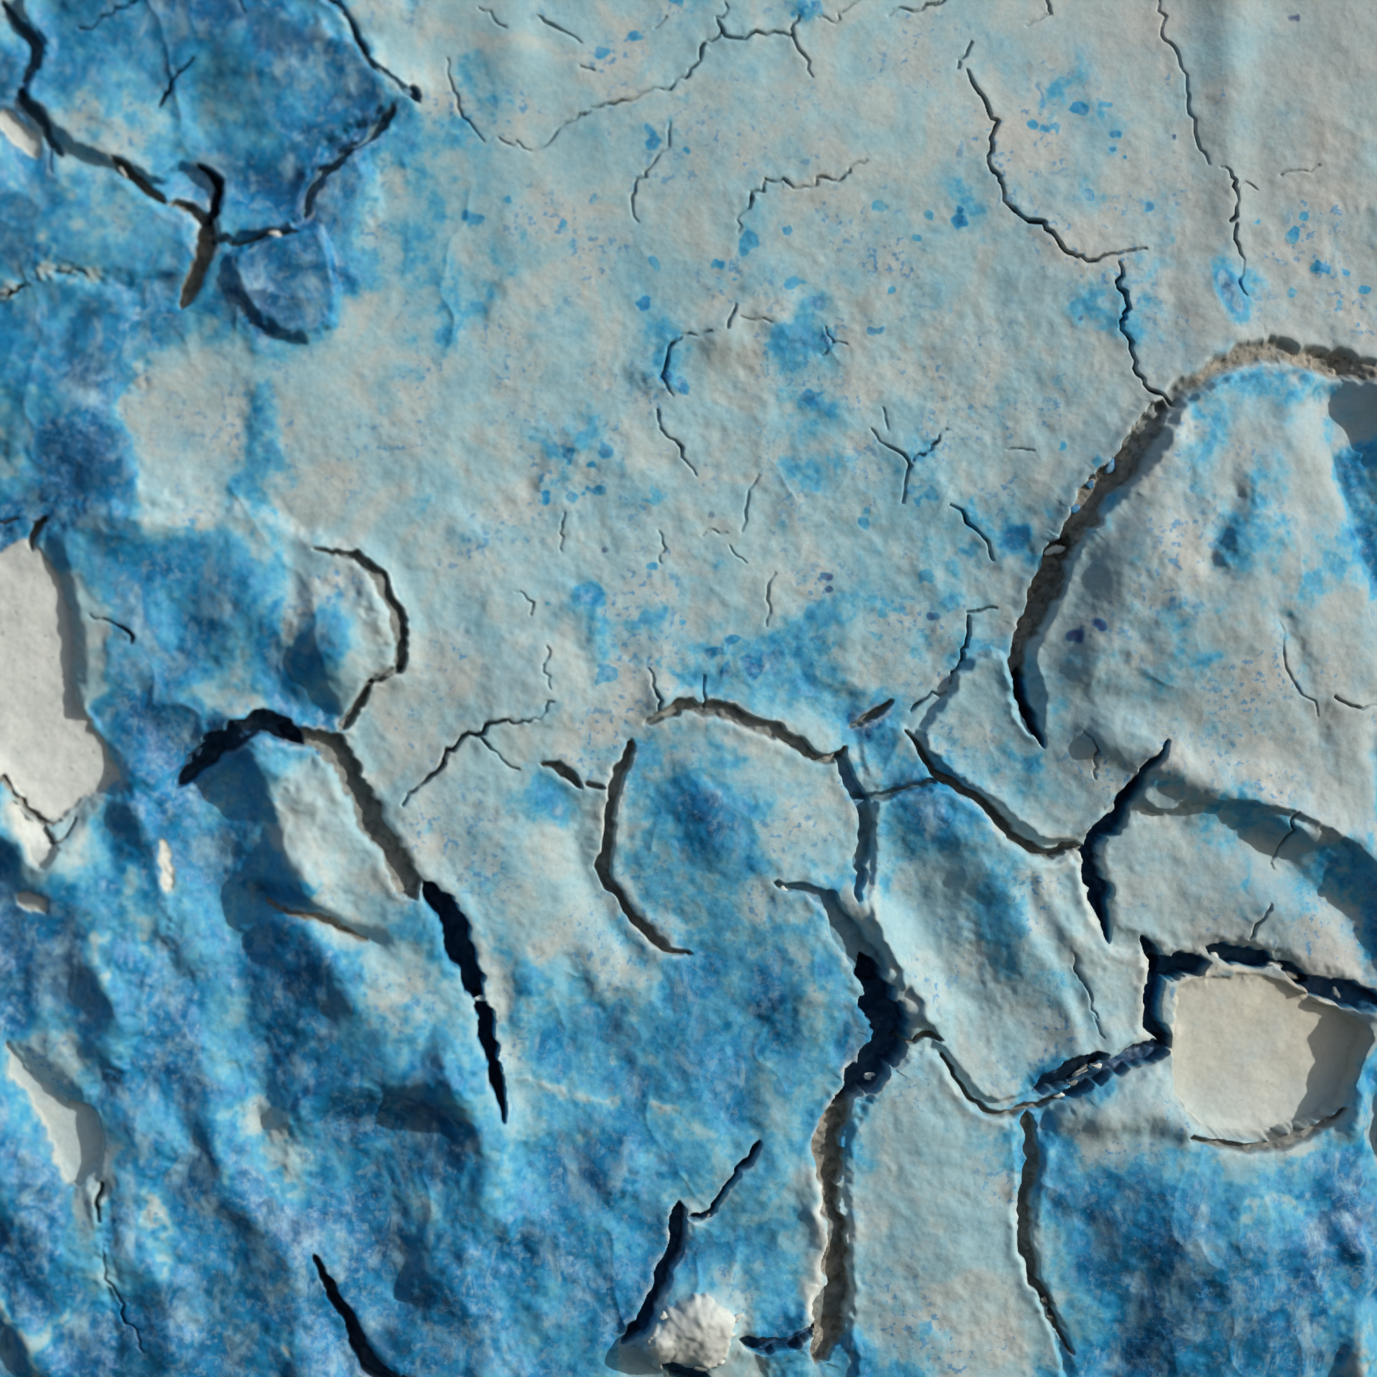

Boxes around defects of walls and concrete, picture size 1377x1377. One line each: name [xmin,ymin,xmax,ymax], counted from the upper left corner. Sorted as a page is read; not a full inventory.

crack [1,1,67,174]
crack [0,268,89,302]
crack [78,0,139,32]
crack [107,0,947,315]
crack [171,544,555,1131]
peeling [0,0,876,1377]
crack [540,0,1377,1377]
peeling [847,723,1377,1377]
crack [308,1250,414,1377]